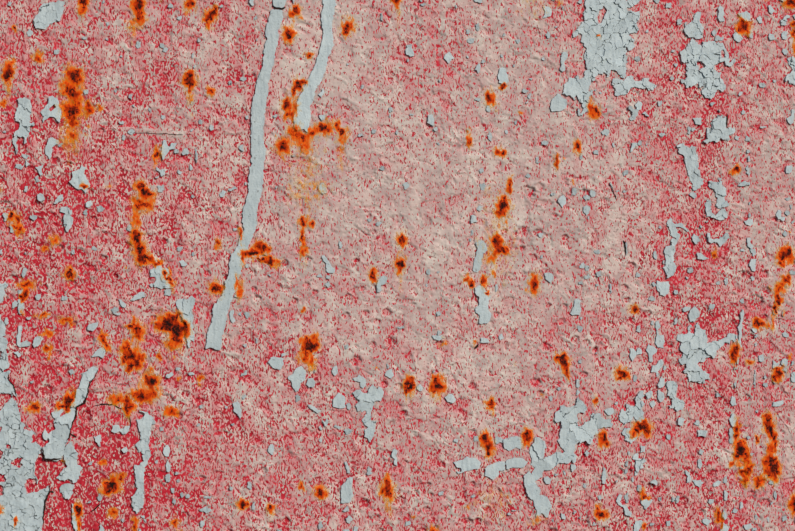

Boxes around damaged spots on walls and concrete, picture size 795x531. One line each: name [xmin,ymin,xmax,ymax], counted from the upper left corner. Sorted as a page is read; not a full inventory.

peeling [205,0,295,350]
rust [275,78,349,167]
peeling [293,0,337,132]
peeling [550,0,657,116]
peeling [0,282,106,531]
rust [97,311,191,417]
rust [130,180,176,290]
rust [463,175,513,296]
peeling [453,321,685,531]
peeling [674,298,795,390]
rust [729,412,783,489]
rust [752,245,795,330]